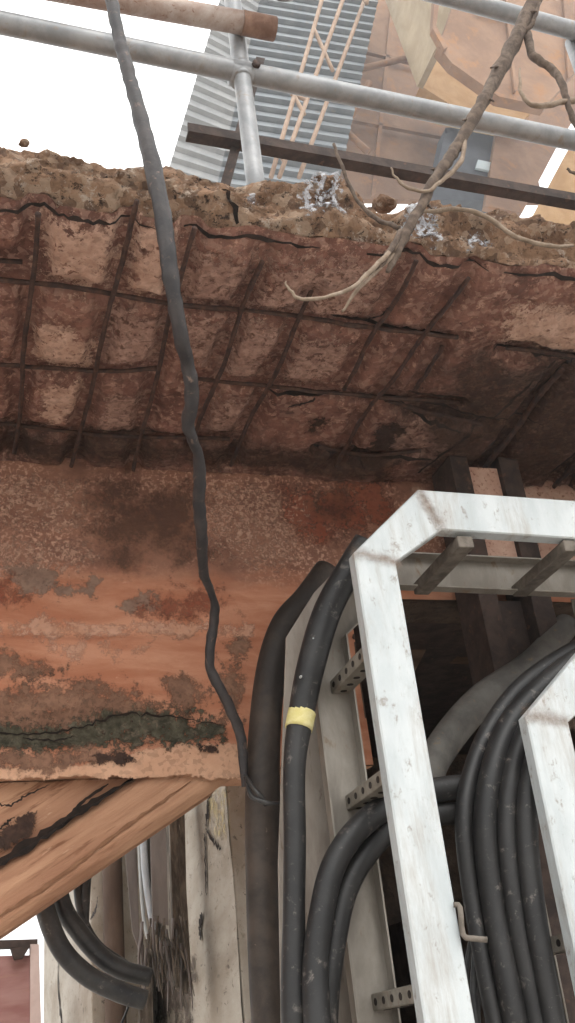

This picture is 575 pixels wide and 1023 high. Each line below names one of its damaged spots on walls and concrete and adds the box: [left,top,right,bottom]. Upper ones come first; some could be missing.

crack [0,202,156,230]
crack [184,182,319,248]
leakage [297,171,347,216]
leakage [398,202,443,250]
spalling [0,146,180,431]
spalling [163,166,575,434]
crack [367,248,575,281]
peeling [0,473,104,603]
leakage [92,479,196,568]
corrosion [132,580,230,620]
leakage [0,741,131,777]
crack [0,778,191,917]